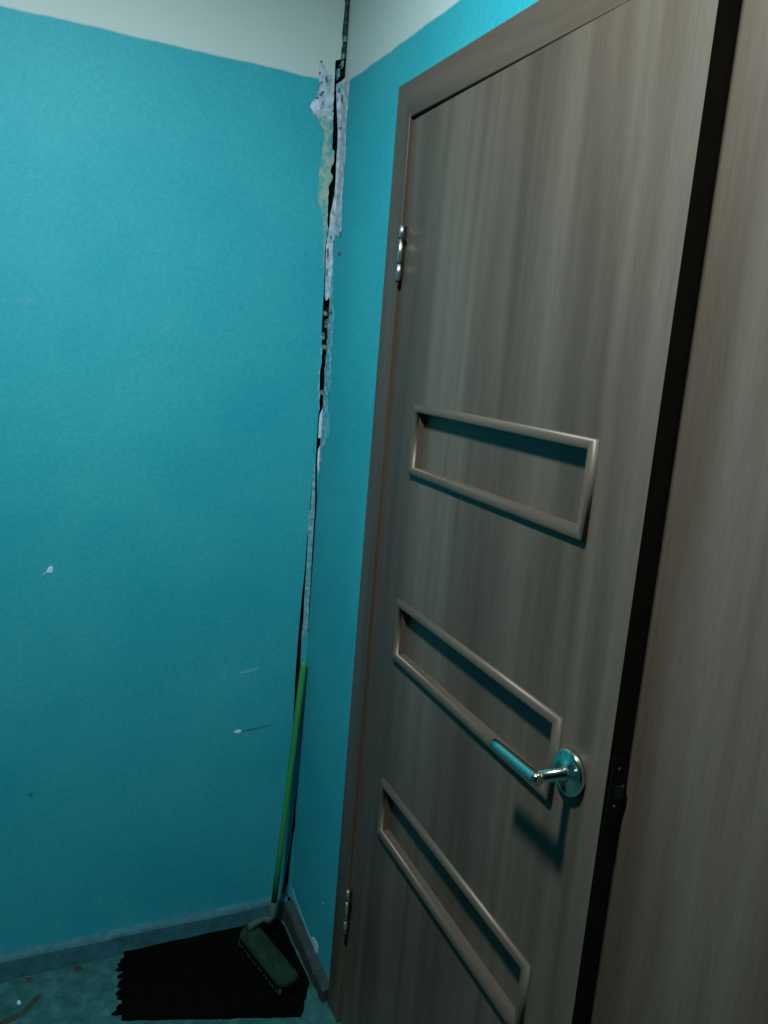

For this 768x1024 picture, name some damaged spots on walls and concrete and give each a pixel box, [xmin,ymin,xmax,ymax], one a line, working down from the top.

peeling [310,60,349,473]
crack [315,0,349,513]
crack [282,781,298,893]
crack [293,545,308,716]